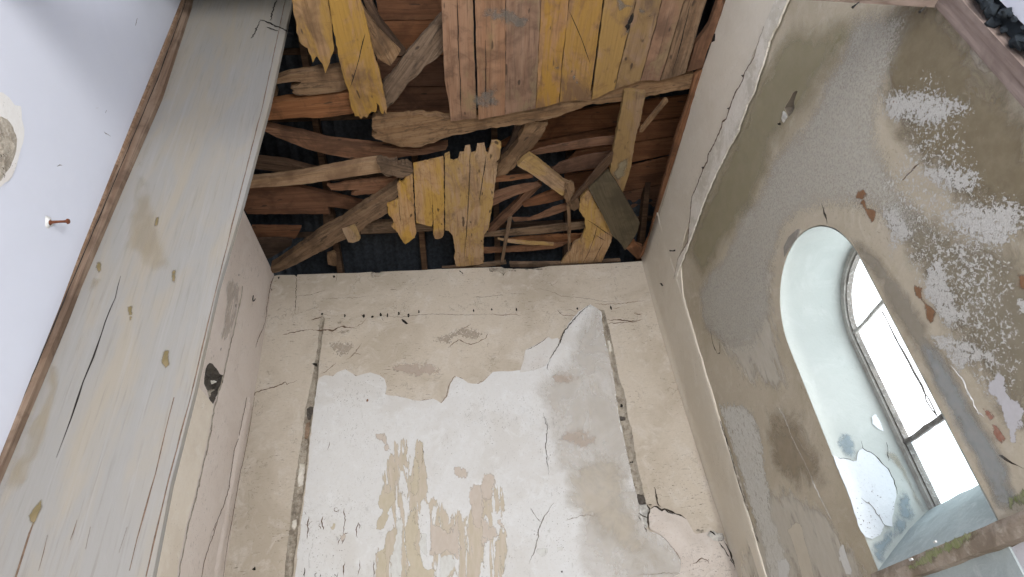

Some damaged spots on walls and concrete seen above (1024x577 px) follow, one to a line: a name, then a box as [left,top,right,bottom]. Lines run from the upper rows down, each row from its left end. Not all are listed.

crack [251,0,293,38]
peeling [0,92,24,187]
leakage [693,6,1024,426]
rust [856,190,876,222]
rust [914,286,935,322]
crack [56,276,121,457]
peeling [157,275,243,577]
crack [202,382,293,577]
peeling [292,305,681,577]
crack [638,487,735,575]
leakage [770,421,817,482]
flaking render [833,449,897,539]